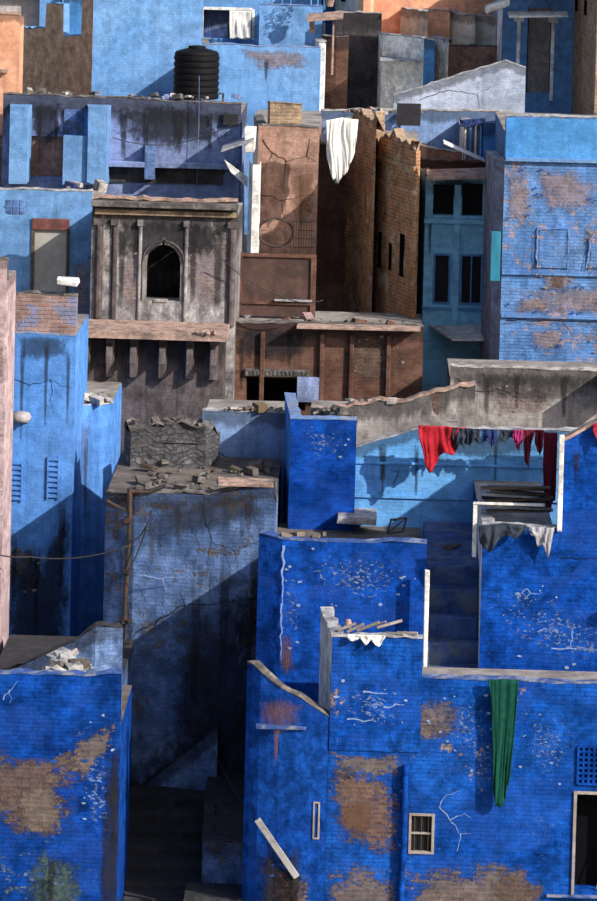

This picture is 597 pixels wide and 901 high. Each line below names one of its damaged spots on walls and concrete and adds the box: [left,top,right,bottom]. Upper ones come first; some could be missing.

crack [260,139,317,213]
flaking render [507,167,597,220]
flaking render [507,272,597,315]
flaking render [533,330,563,349]
crack [140,504,259,626]
crack [278,546,286,654]
flaking render [421,694,492,786]
peeling [523,713,571,773]
flaking render [0,725,115,844]
flaking render [328,752,401,856]
crack [439,791,471,850]
flaking render [327,861,543,901]